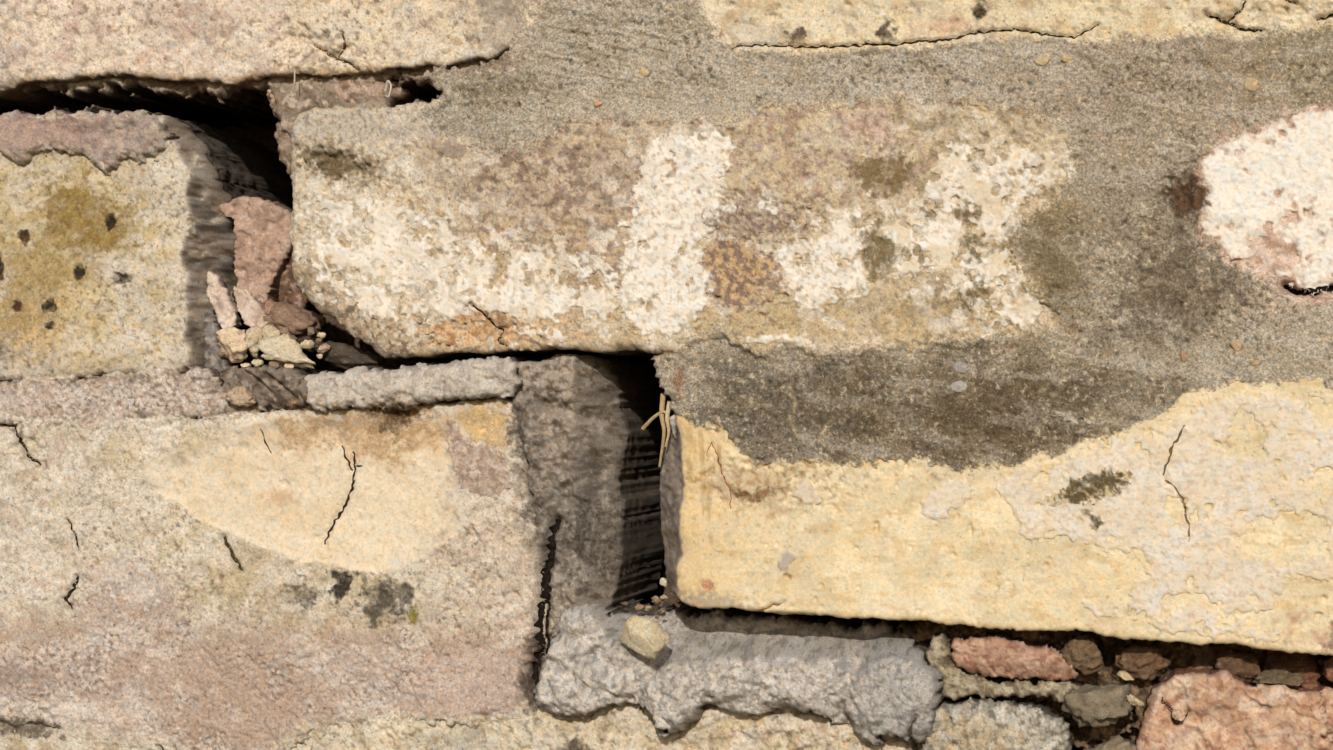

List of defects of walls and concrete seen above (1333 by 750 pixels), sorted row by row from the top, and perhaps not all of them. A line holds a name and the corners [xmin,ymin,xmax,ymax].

crack [732,24,1099,49]
crack [1205,1,1262,32]
crack [1286,0,1333,21]
peeling [206,271,269,329]
crack [0,422,41,465]
crack [324,446,362,545]
crack [64,519,79,609]
crack [224,536,242,571]
crack [532,519,561,688]